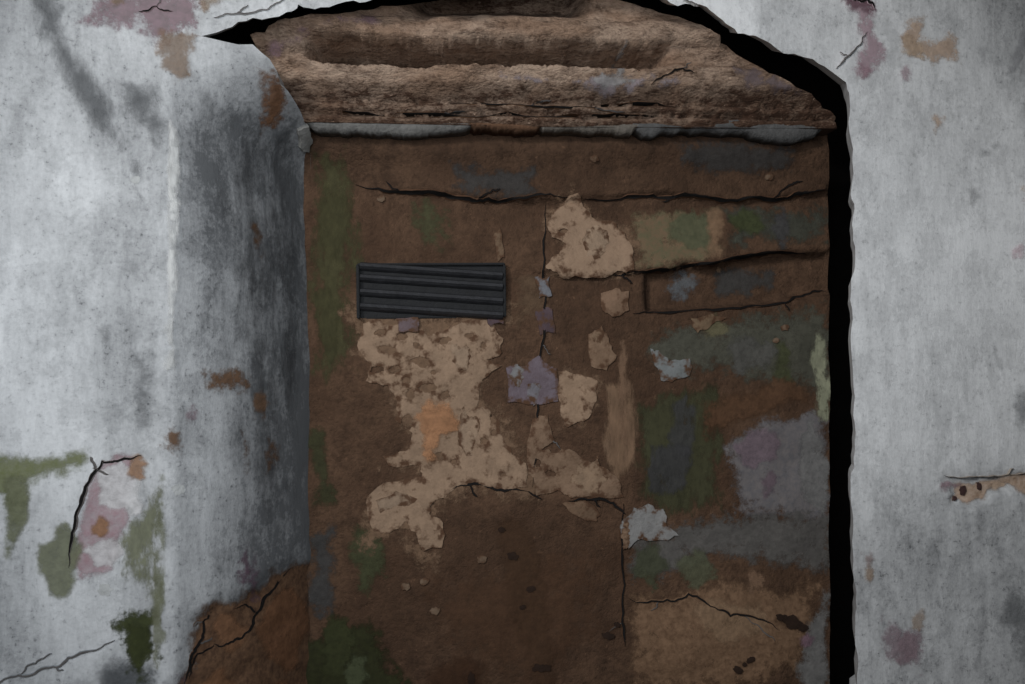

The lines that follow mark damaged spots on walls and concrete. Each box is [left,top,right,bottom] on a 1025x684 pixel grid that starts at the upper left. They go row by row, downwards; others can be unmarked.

crack [138,0,173,12]
crack [836,0,875,68]
flaking render [535,185,644,335]
crack [357,181,827,358]
flaking render [650,348,692,382]
crack [0,640,114,684]
crack [68,455,141,568]
flaking render [178,558,310,684]
flaking render [338,301,623,569]
flaking render [620,504,679,550]
crack [569,497,780,646]
flaking render [941,475,1025,503]